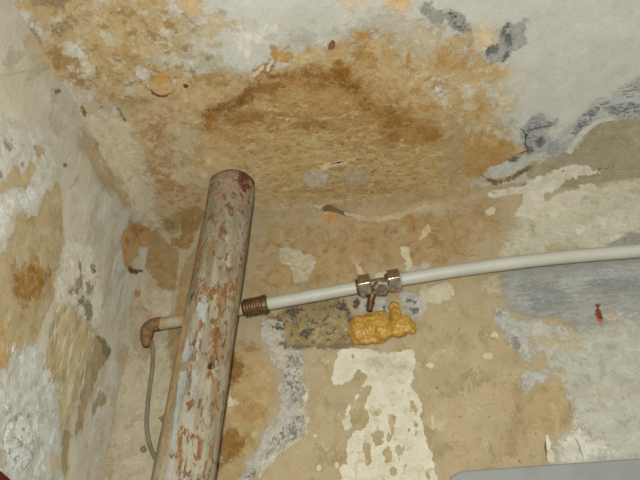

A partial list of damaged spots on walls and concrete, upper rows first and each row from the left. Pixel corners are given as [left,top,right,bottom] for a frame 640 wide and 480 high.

flaking render [28,0,218,122]
rust [157,169,281,480]
leakage [1,0,640,298]
flaking render [218,84,454,225]
peeling [238,258,640,480]
flaking render [380,1,640,219]
rust [594,304,603,325]
peeling [604,228,640,247]